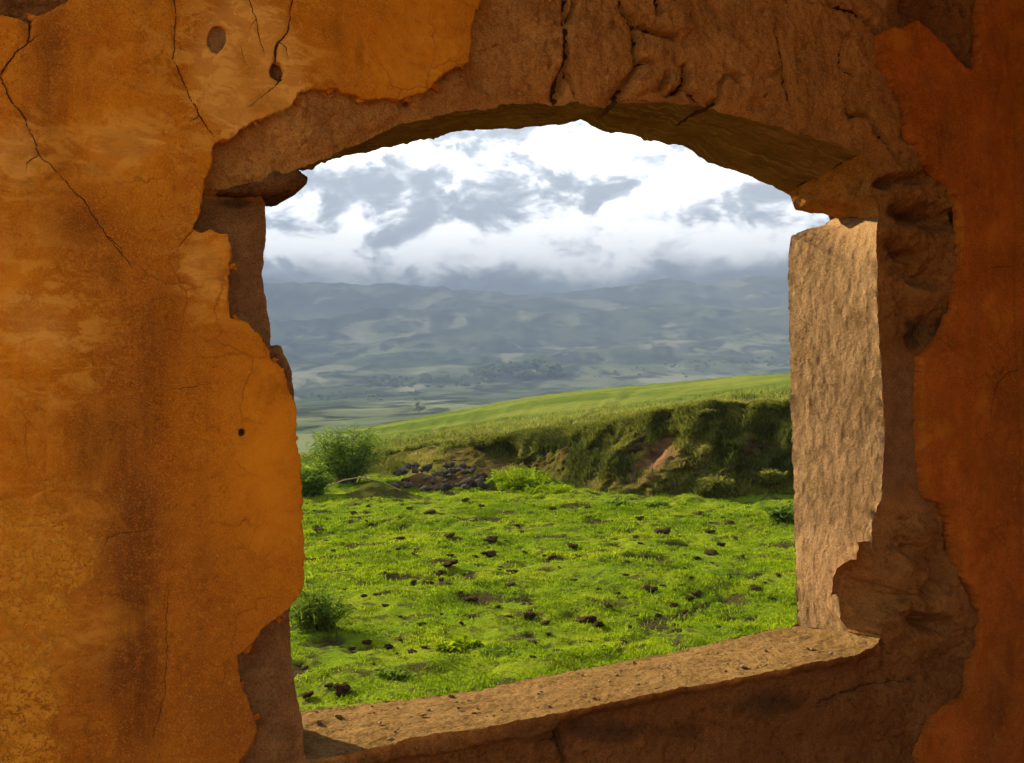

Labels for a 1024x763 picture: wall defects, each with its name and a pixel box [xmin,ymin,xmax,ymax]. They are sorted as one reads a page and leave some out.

crack [172,0,214,137]
crack [241,0,293,108]
crack [550,0,575,106]
crack [0,24,131,266]
spalling [192,0,981,763]